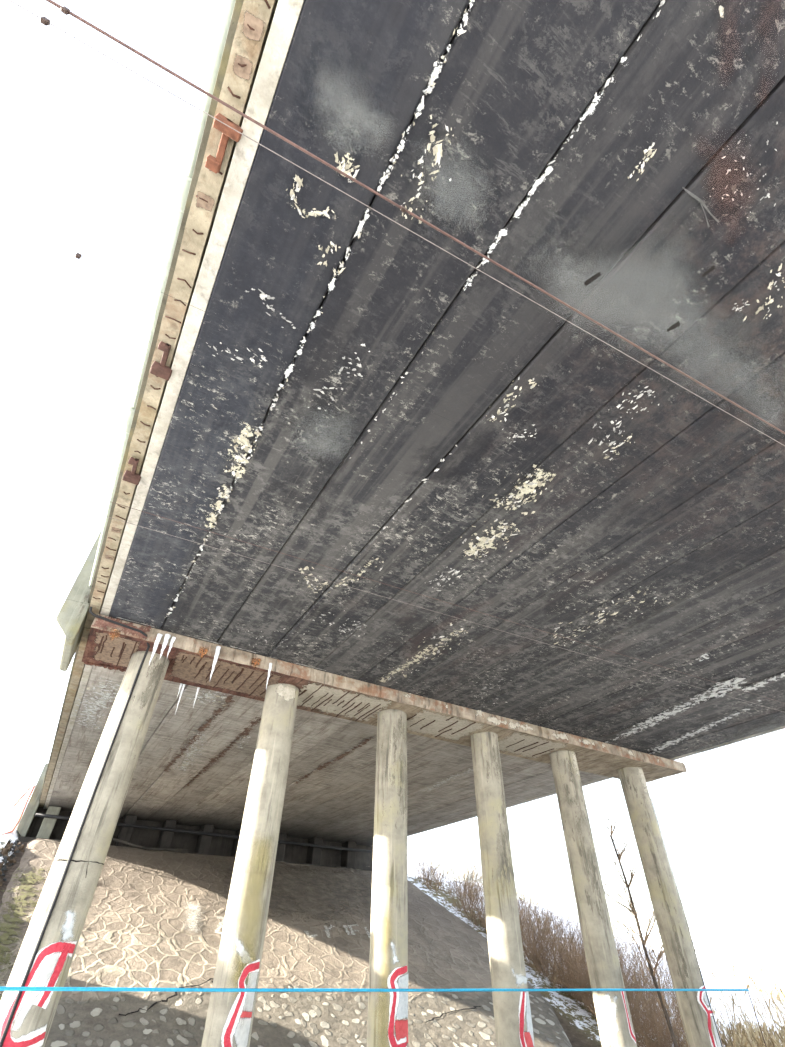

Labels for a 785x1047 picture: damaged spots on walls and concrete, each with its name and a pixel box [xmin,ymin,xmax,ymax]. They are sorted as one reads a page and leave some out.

water stain [377,0,474,192]
water stain [439,169,470,208]
water stain [463,77,613,291]
peeling [205,422,262,528]
peeling [461,464,556,562]
rust [91,614,151,640]
water stain [606,672,785,754]
crack [119,978,214,1016]